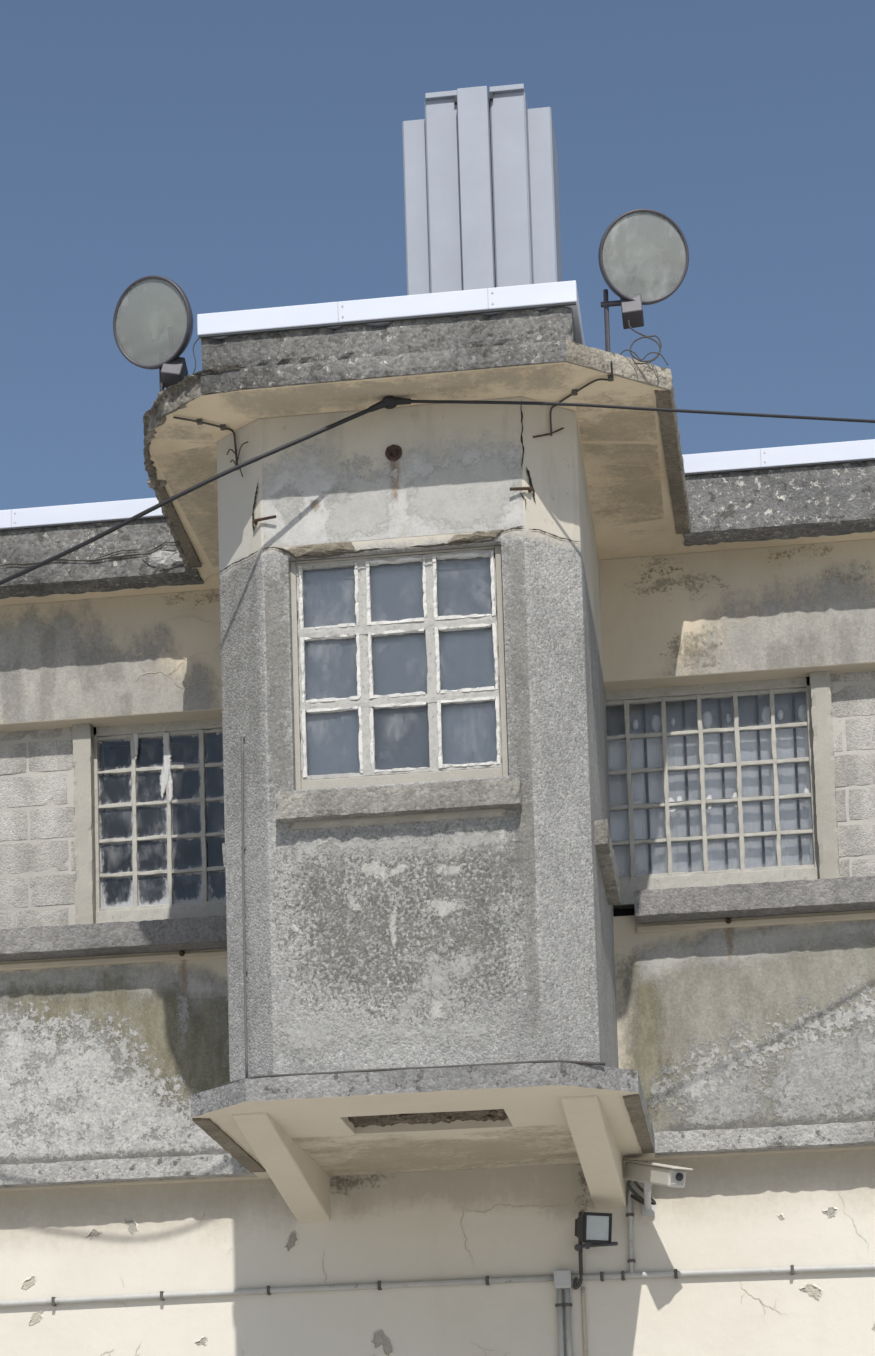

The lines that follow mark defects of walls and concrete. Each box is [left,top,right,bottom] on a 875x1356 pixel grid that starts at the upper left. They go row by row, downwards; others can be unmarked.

spalling [142,365,247,571]
peeling [262,443,524,559]
crack [503,405,581,542]
damp [0,608,213,723]
damp [675,576,875,676]
damp [0,964,229,1164]
peeling [370,1329,393,1356]
peeling [799,1283,823,1301]